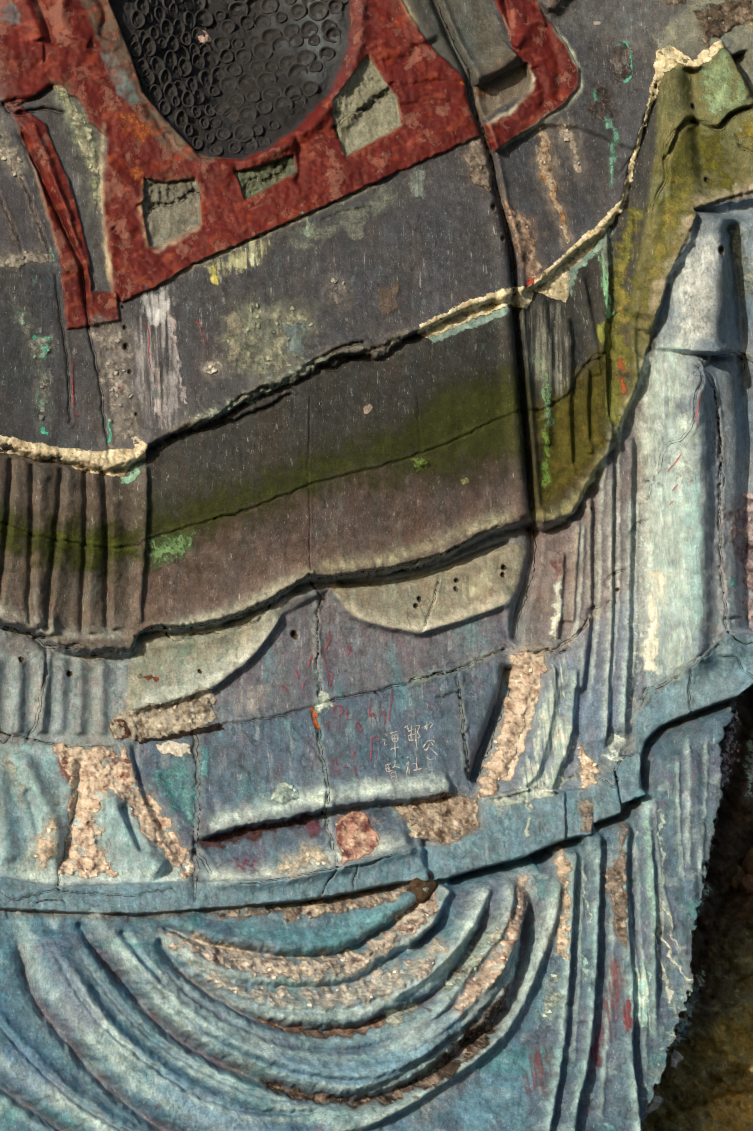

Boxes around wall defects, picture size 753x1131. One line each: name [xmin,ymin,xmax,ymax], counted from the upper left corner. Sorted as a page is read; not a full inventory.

spalling [666,0,753,47]
spalling [464,135,494,192]
crack [630,349,753,707]
spalling [726,493,753,630]
spalling [34,688,224,879]
spalling [166,883,449,1038]
spalling [272,811,379,877]
spalling [261,877,528,1109]
spalling [393,651,548,845]
spalling [602,823,629,946]